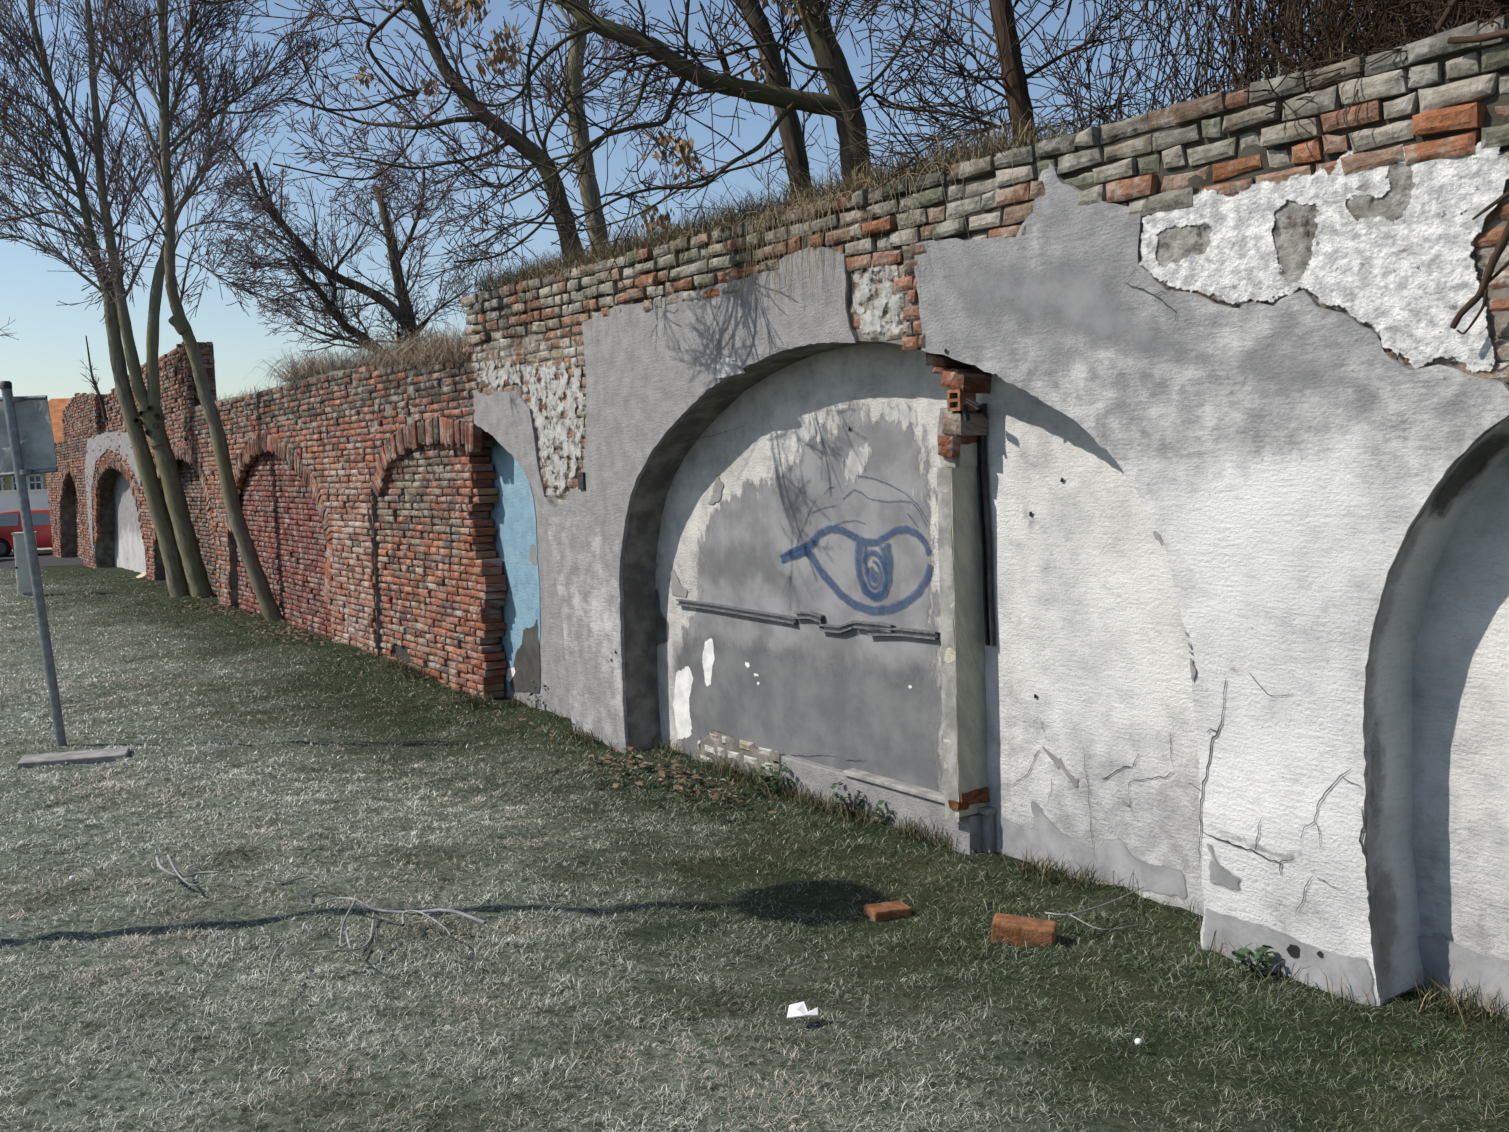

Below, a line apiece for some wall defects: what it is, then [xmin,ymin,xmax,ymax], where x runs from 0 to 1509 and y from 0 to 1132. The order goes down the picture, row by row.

flaking render [476,358,585,495]
flaking render [715,357,745,378]
flaking render [844,240,930,350]
flaking render [1139,142,1509,373]
flaking render [655,401,943,791]
crack [1010,671,1372,946]